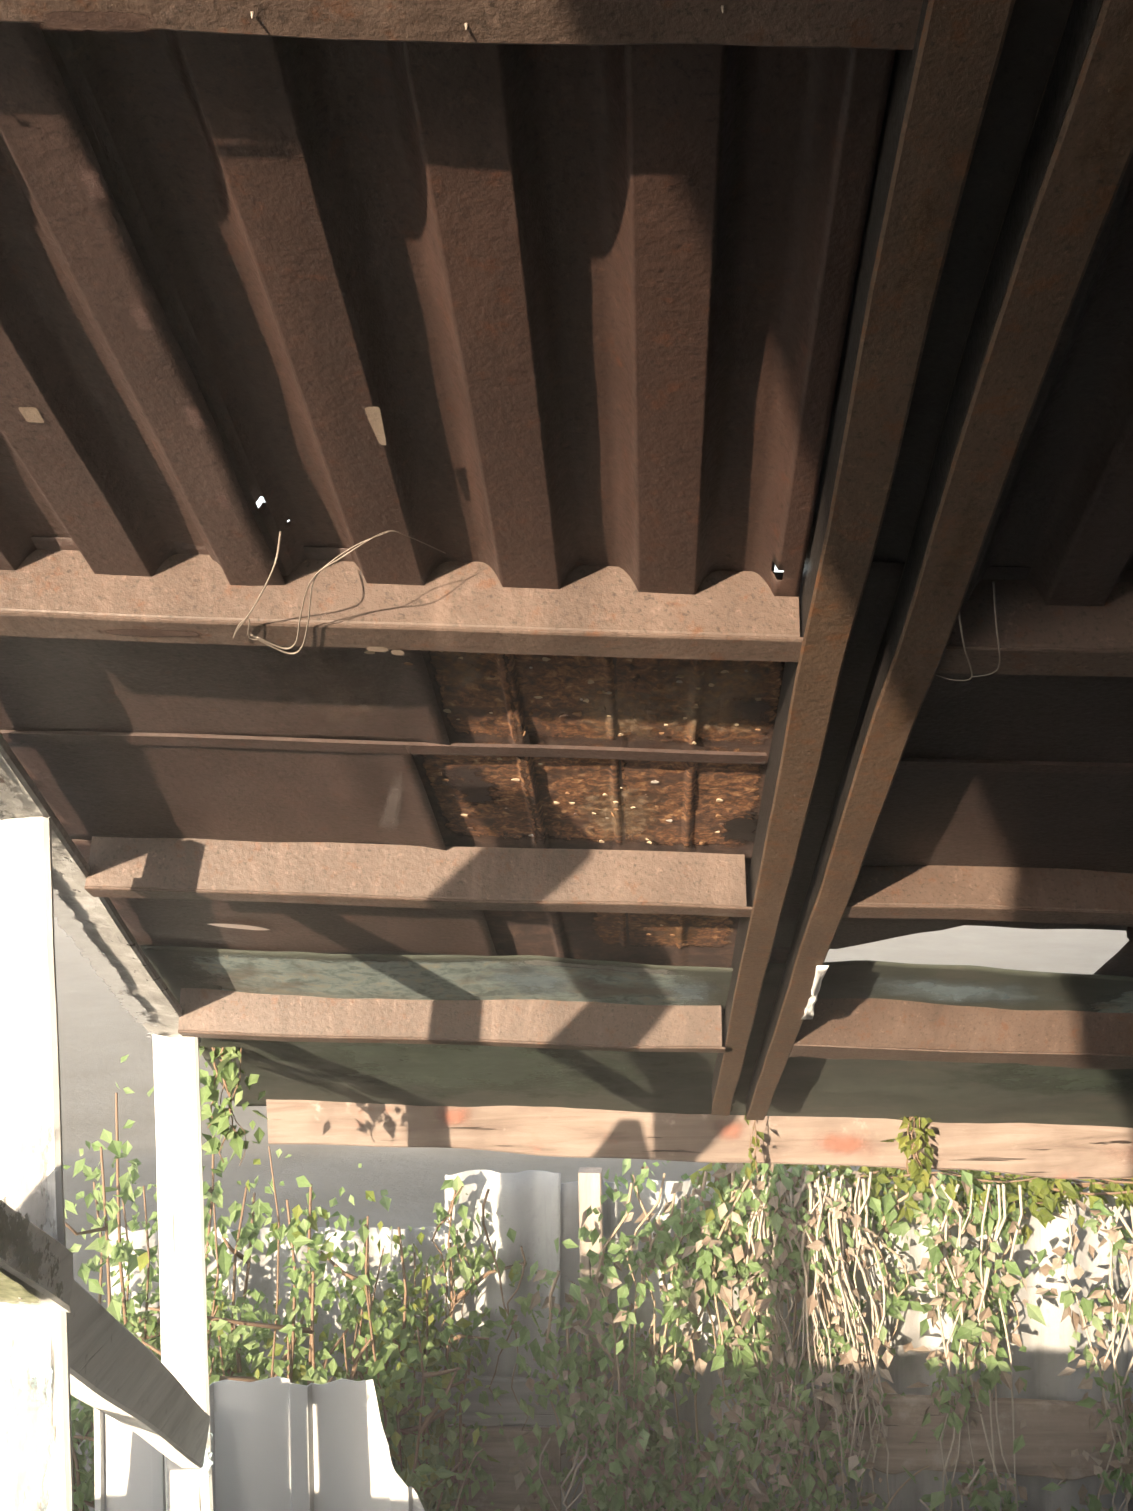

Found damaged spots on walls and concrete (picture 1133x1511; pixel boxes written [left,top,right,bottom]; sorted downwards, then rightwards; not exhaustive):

rust [366,646,404,655]
rust [419,651,785,848]
peeling [0,770,32,820]
rust [591,912,735,949]
peeling [53,885,158,1038]